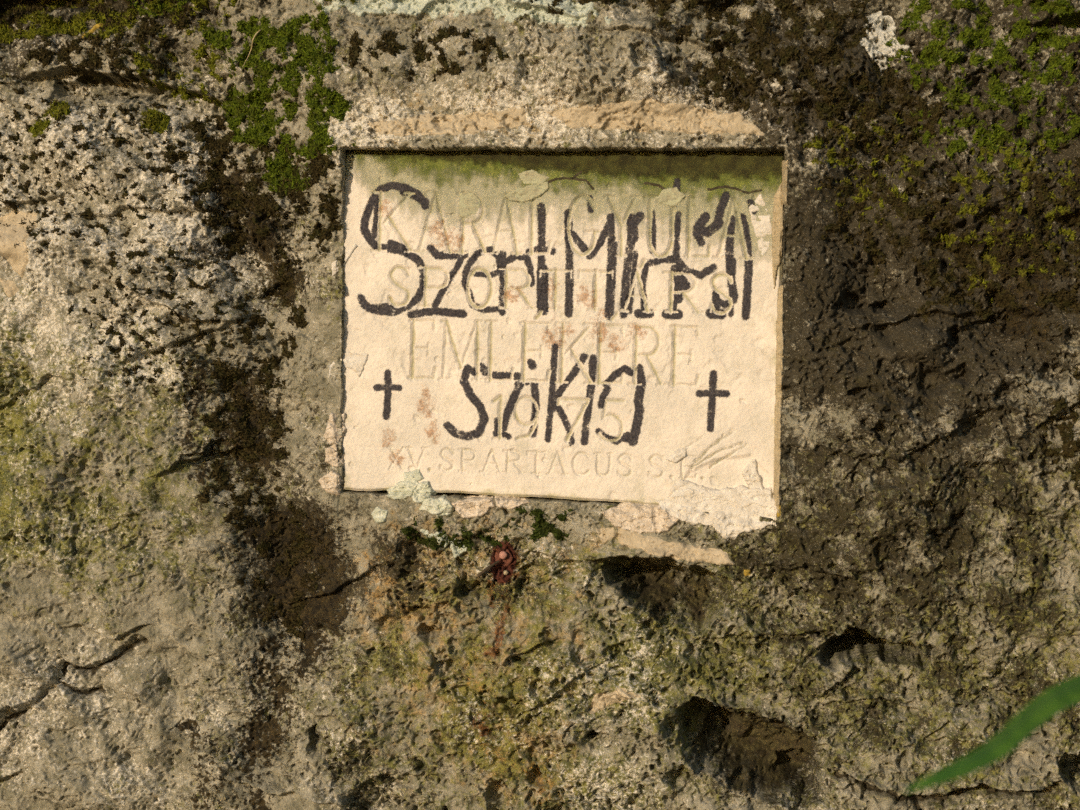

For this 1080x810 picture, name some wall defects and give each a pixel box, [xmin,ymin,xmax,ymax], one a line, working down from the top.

corrosion [484,541,520,658]
crack [61,638,149,694]
crack [0,710,27,731]